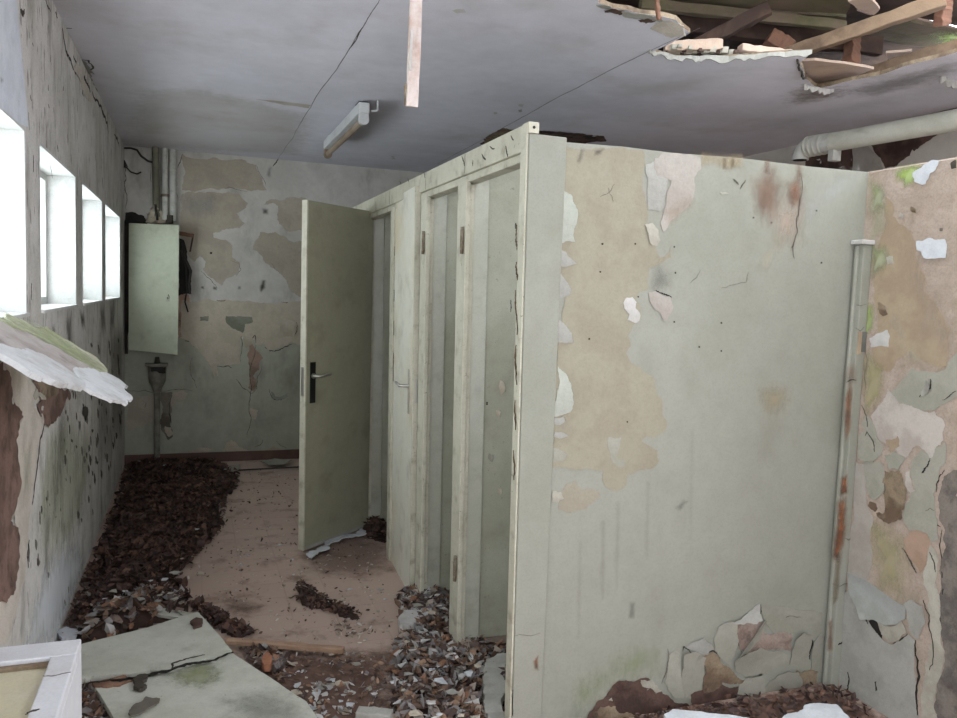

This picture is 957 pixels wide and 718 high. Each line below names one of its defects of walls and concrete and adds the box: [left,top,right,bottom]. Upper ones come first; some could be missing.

crack [46,1,119,144]
peeling [178,155,306,378]
crack [257,0,380,166]
flaking render [462,128,514,166]
peeling [539,131,701,513]
peeling [596,5,686,38]
crack [791,176,803,257]
peeling [912,160,939,185]
peeling [0,362,197,645]
rust [833,477,847,558]
peeling [839,197,957,718]
peeling [587,603,824,718]